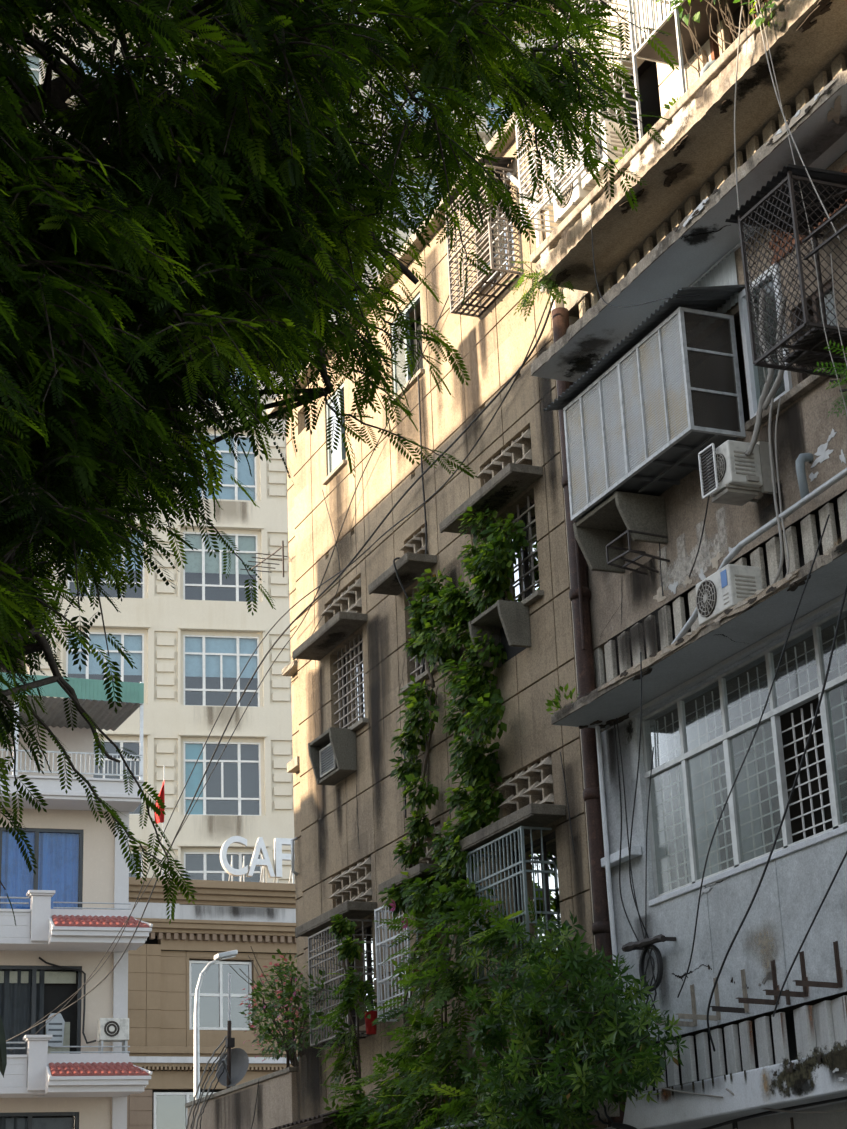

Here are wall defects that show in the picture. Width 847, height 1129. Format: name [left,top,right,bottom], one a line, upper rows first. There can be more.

leakage [737,0,805,97]
leakage [679,225,730,245]
leakage [538,339,547,357]
leakage [564,338,609,377]
leakage [540,377,555,488]
peeling [809,429,846,482]
leakage [763,1040,847,1097]